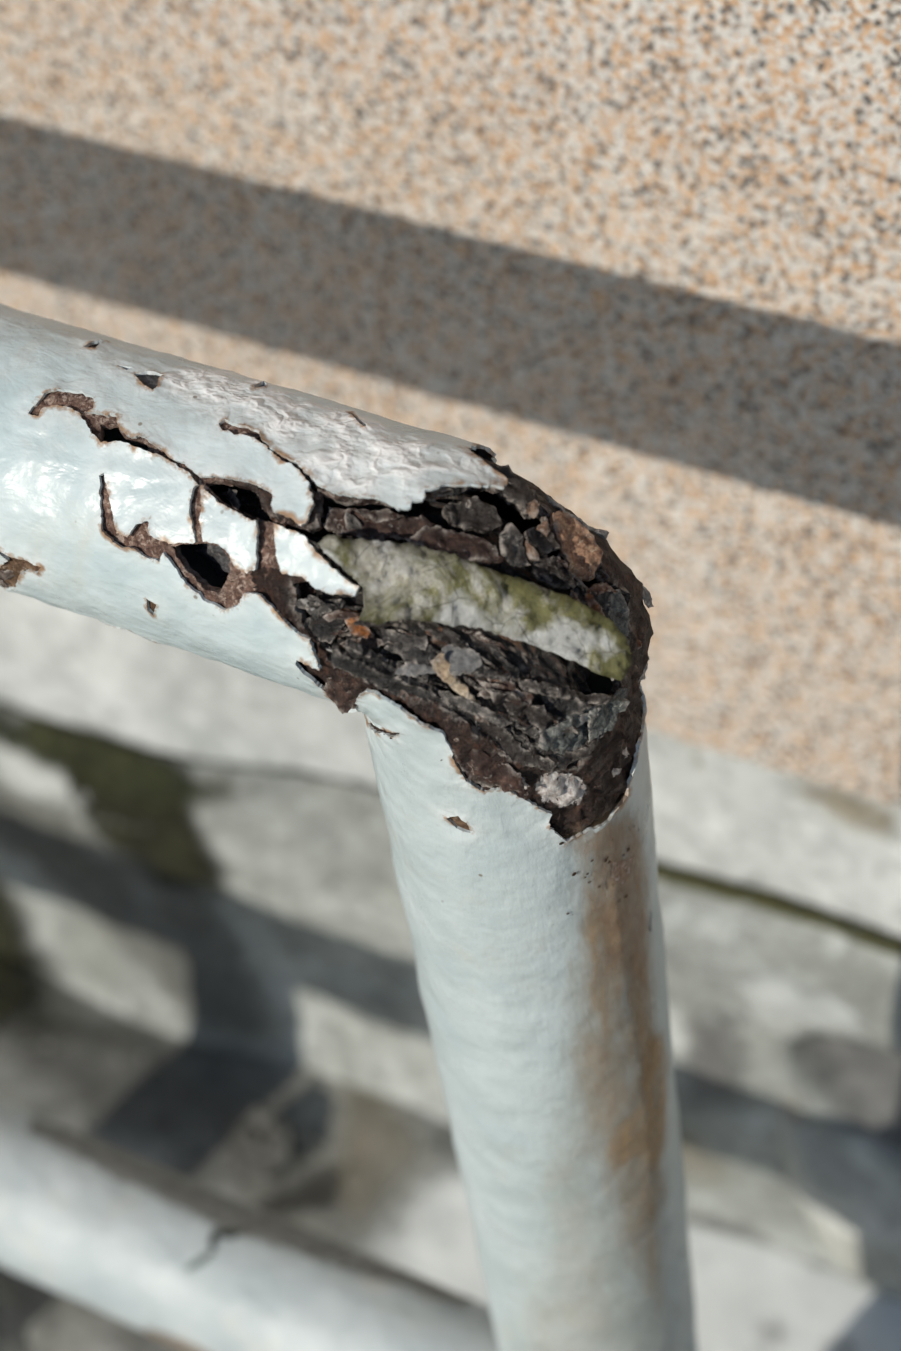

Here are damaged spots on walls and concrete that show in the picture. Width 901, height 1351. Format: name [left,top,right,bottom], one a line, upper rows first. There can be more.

peeling [126,369,160,389]
peeling [274,524,361,596]
rust [162,449,654,838]